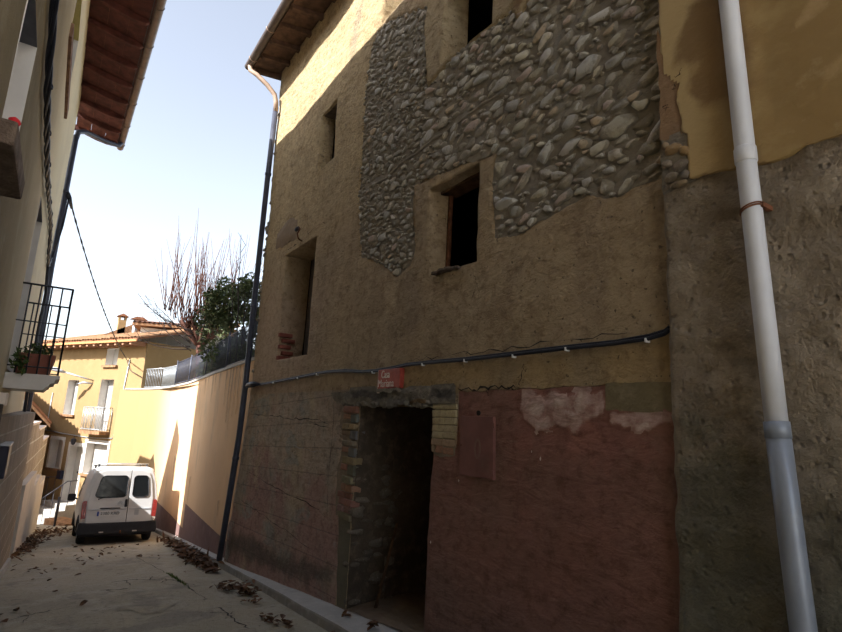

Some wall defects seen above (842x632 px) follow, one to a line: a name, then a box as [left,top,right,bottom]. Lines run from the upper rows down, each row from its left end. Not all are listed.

spalling [656,30,697,195]
damp [663,0,731,120]
damp [739,0,783,105]
peeling [518,382,674,437]